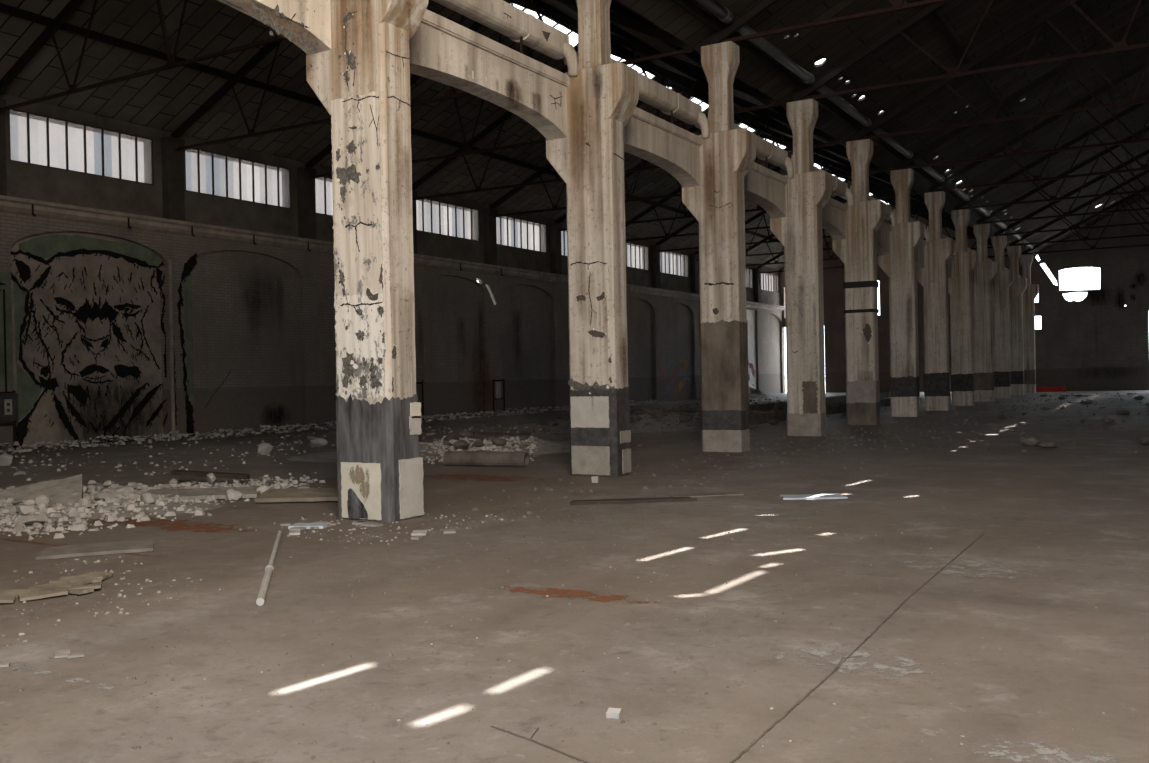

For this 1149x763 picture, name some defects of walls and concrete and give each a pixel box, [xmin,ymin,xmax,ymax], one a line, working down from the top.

peeling [332,123,380,219]
peeling [334,261,397,395]
corrosion [485,586,657,603]